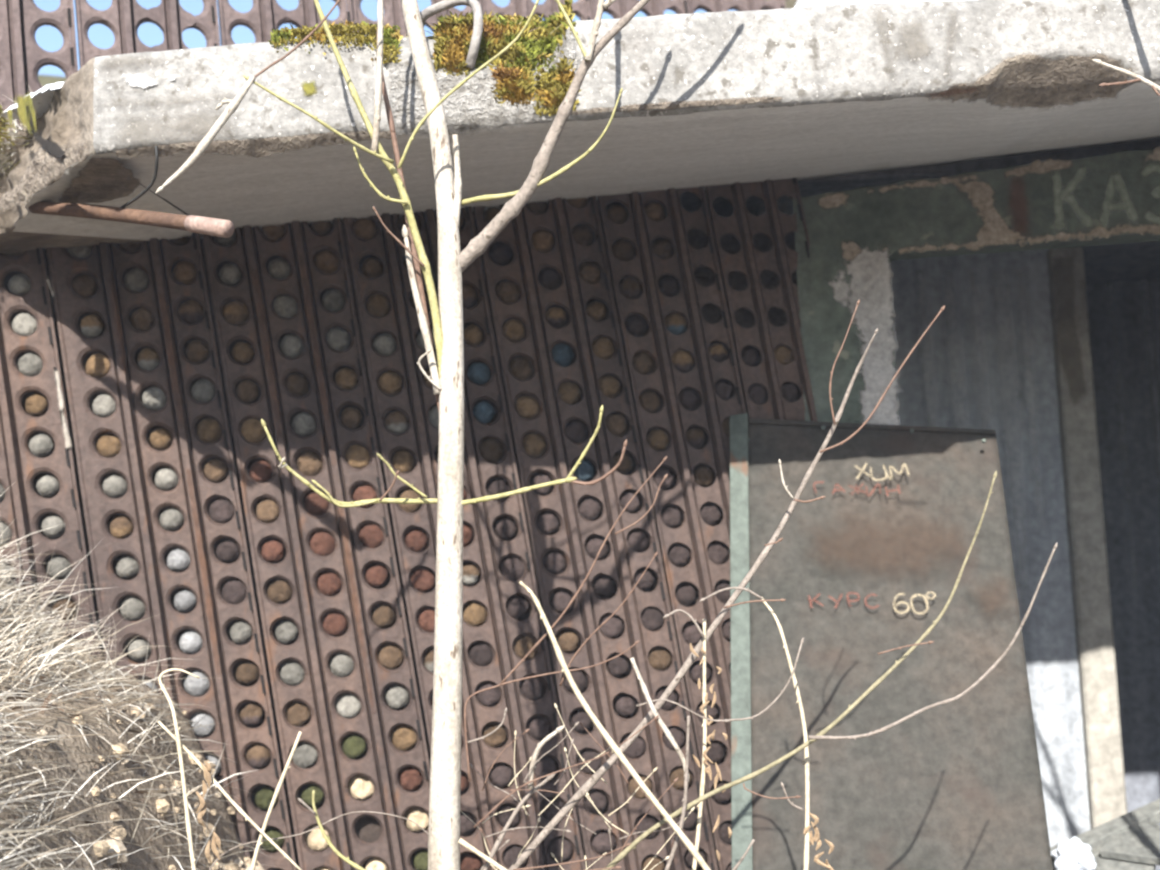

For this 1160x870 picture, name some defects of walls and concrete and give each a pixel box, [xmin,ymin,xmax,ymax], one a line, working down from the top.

spalling [435,25,581,133]
spalling [571,97,782,115]
spalling [929,53,1131,108]
spalling [0,61,429,211]
peeling [1005,159,1073,178]
peeling [818,192,849,210]
peeling [829,175,1160,425]